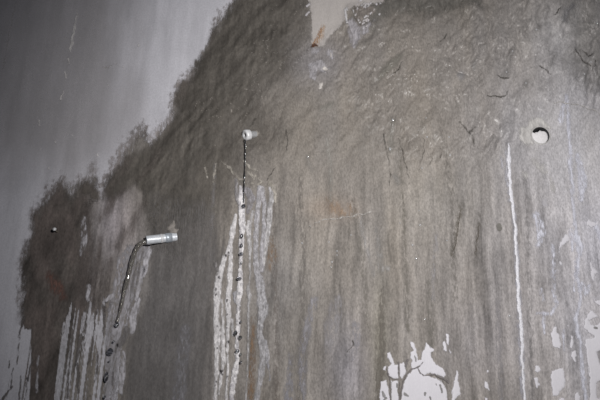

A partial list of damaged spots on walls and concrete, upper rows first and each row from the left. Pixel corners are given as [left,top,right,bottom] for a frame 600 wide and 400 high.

peeling [305,0,384,89]
leakage [60,337,71,400]
leakage [68,328,80,400]
leakage [74,343,84,400]
leakage [83,336,102,400]
leakage [100,269,141,400]
leakage [217,255,229,400]
leakage [227,323,236,400]
peeling [379,342,461,400]
peeling [551,327,561,348]
peeling [550,368,566,400]
peeling [584,311,600,400]